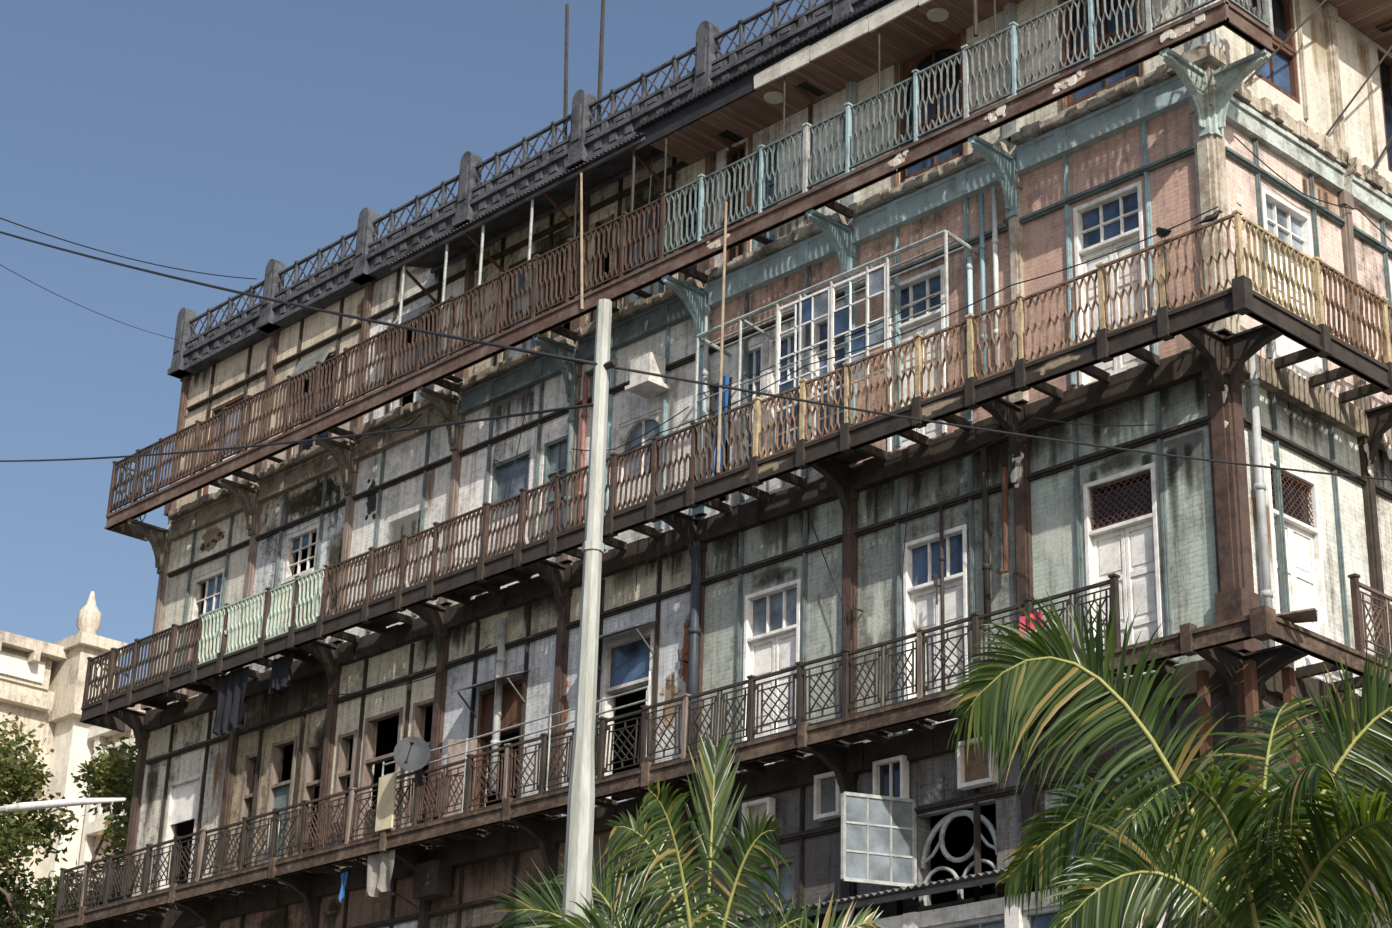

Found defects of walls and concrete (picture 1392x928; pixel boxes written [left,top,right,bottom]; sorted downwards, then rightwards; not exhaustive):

peeling [1160,13,1205,43]
peeling [1052,69,1086,96]
peeling [984,104,1006,123]
peeling [888,149,909,171]
leakage [285,484,340,524]
flaking render [660,612,690,733]